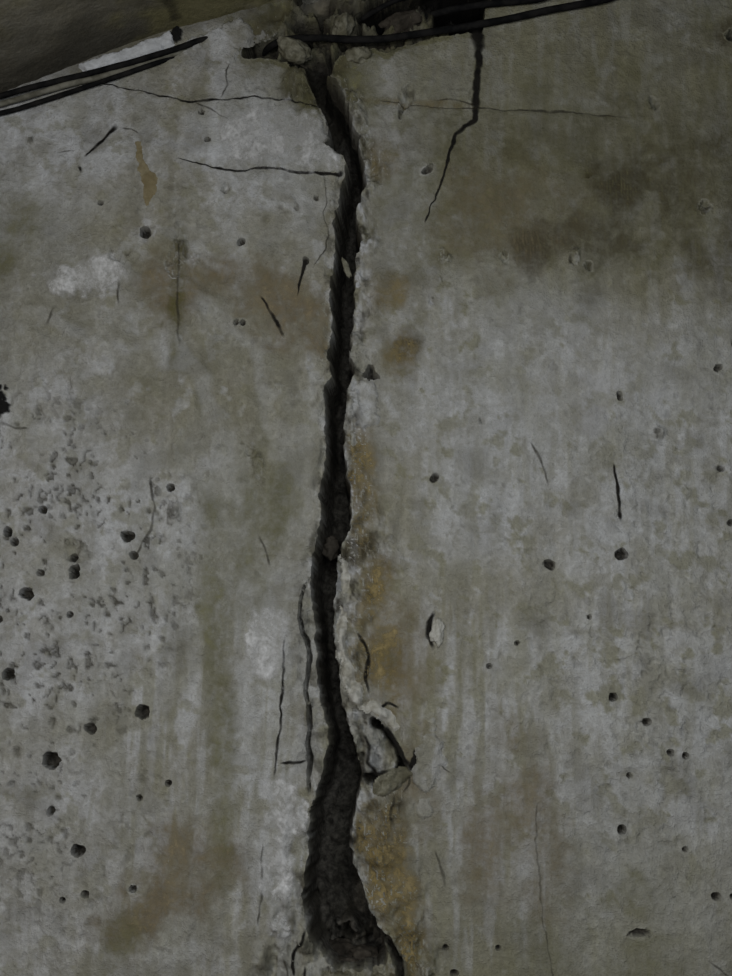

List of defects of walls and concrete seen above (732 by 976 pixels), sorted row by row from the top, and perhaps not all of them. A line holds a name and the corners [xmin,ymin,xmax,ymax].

spalling [79,0,486,167]
crack [383,32,616,221]
crack [104,67,417,976]